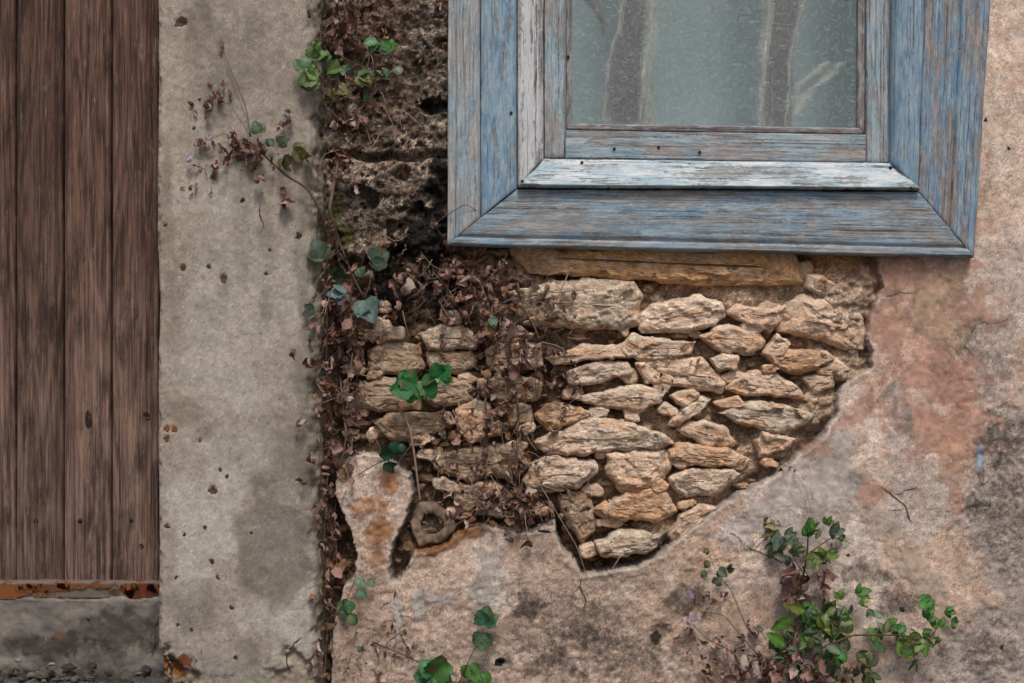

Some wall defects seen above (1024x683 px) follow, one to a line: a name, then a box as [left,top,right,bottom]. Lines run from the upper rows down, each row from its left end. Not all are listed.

corrosion [0,583,159,599]
flaking render [319,0,1015,683]